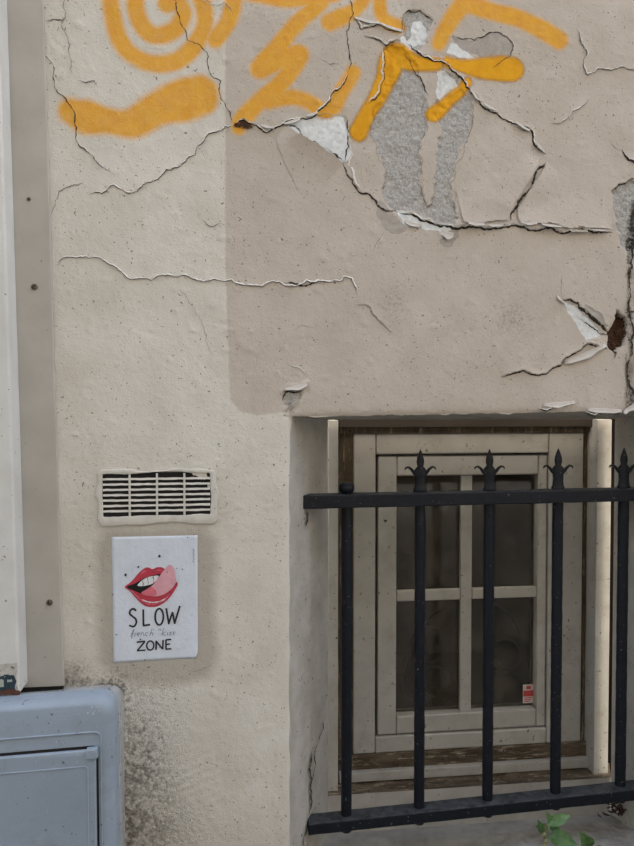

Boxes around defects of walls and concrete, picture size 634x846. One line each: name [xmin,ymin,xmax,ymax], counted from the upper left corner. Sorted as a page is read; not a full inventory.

peeling [447,32,514,68]
peeling [287,116,362,189]
flaking render [354,10,474,247]
crack [46,0,634,416]
flaking render [611,178,634,265]
peeling [505,277,609,377]
crack [303,719,324,845]